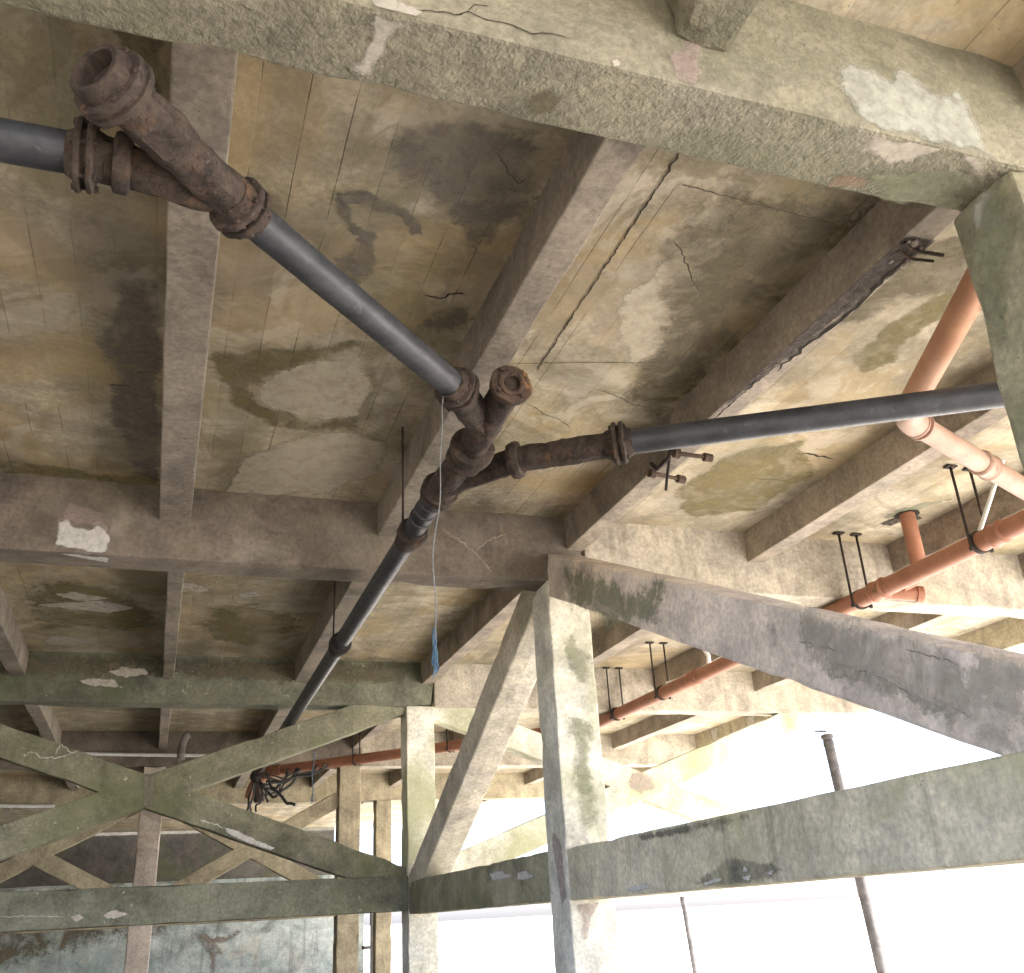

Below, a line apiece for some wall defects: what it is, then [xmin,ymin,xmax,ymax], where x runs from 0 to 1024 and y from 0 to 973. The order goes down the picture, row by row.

crack [417,4,574,39]
peeling [841,65,985,174]
water stain [336,191,422,282]
crack [423,291,464,299]
crack [518,153,742,370]
water stain [840,238,966,372]
water stain [101,282,163,480]
water stain [681,442,813,517]
peeling [56,507,110,562]
peeling [40,592,133,613]
peeling [80,666,148,687]
crack [799,641,972,718]